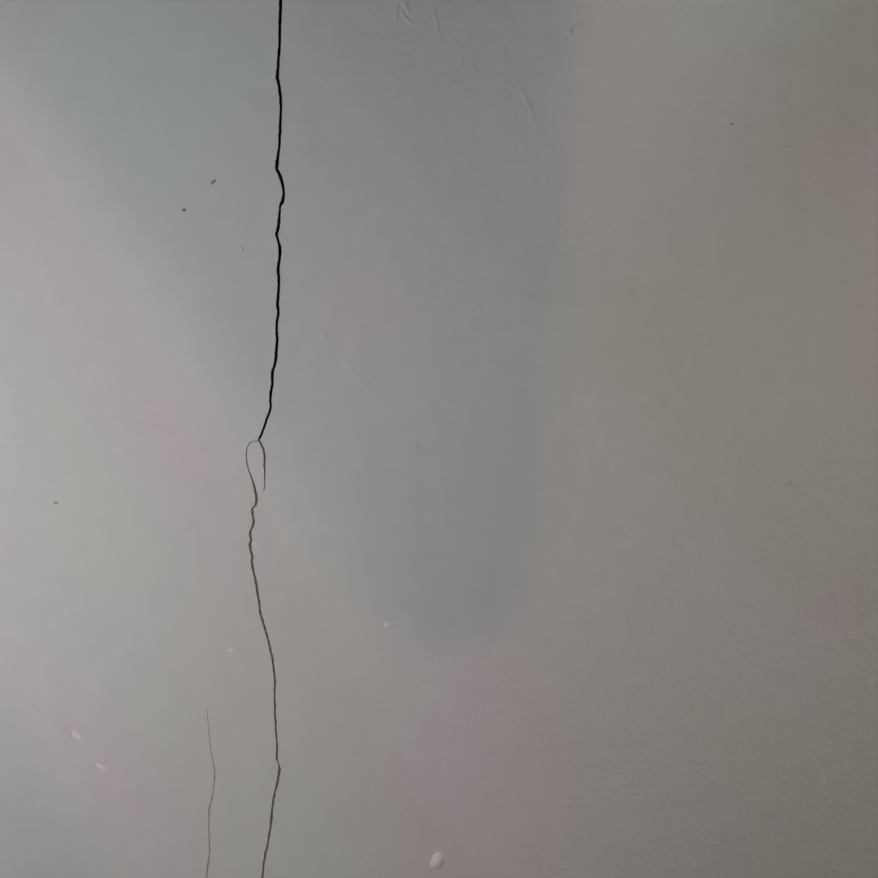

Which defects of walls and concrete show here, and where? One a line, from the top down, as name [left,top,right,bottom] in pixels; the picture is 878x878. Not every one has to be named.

crack [239,0,291,878]